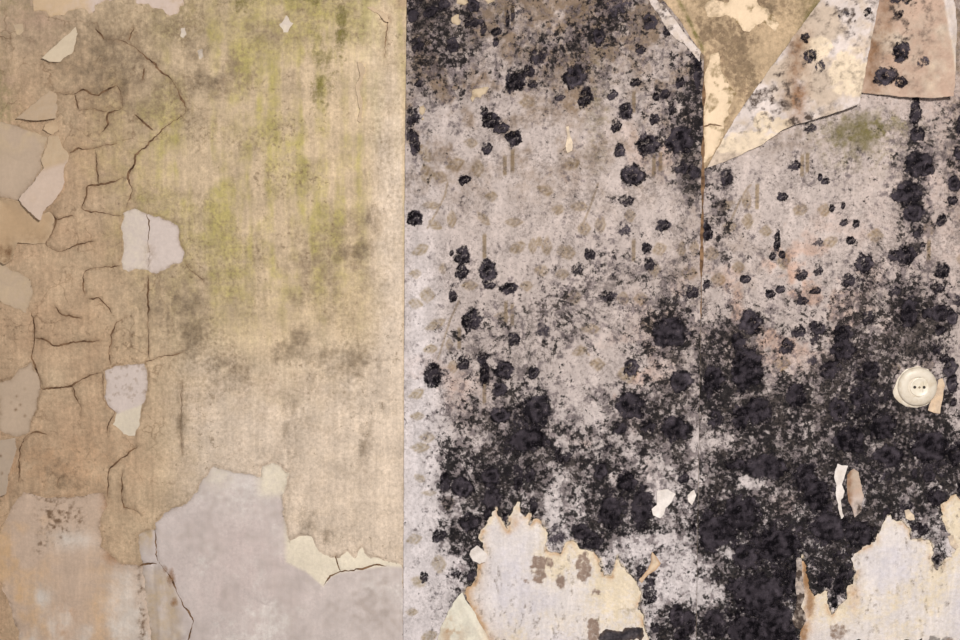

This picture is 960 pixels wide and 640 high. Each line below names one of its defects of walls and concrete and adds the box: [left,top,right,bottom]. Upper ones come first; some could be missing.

crack [46,29,186,252]
water stain [607,58,703,207]
peeling [704,52,737,163]
water stain [887,97,960,266]
crack [31,266,124,436]
crack [146,278,182,361]
water stain [449,245,519,303]
water stain [439,349,581,532]
peeling [0,463,403,640]
crack [325,556,384,583]
peeling [465,502,649,640]
peeling [800,494,960,640]